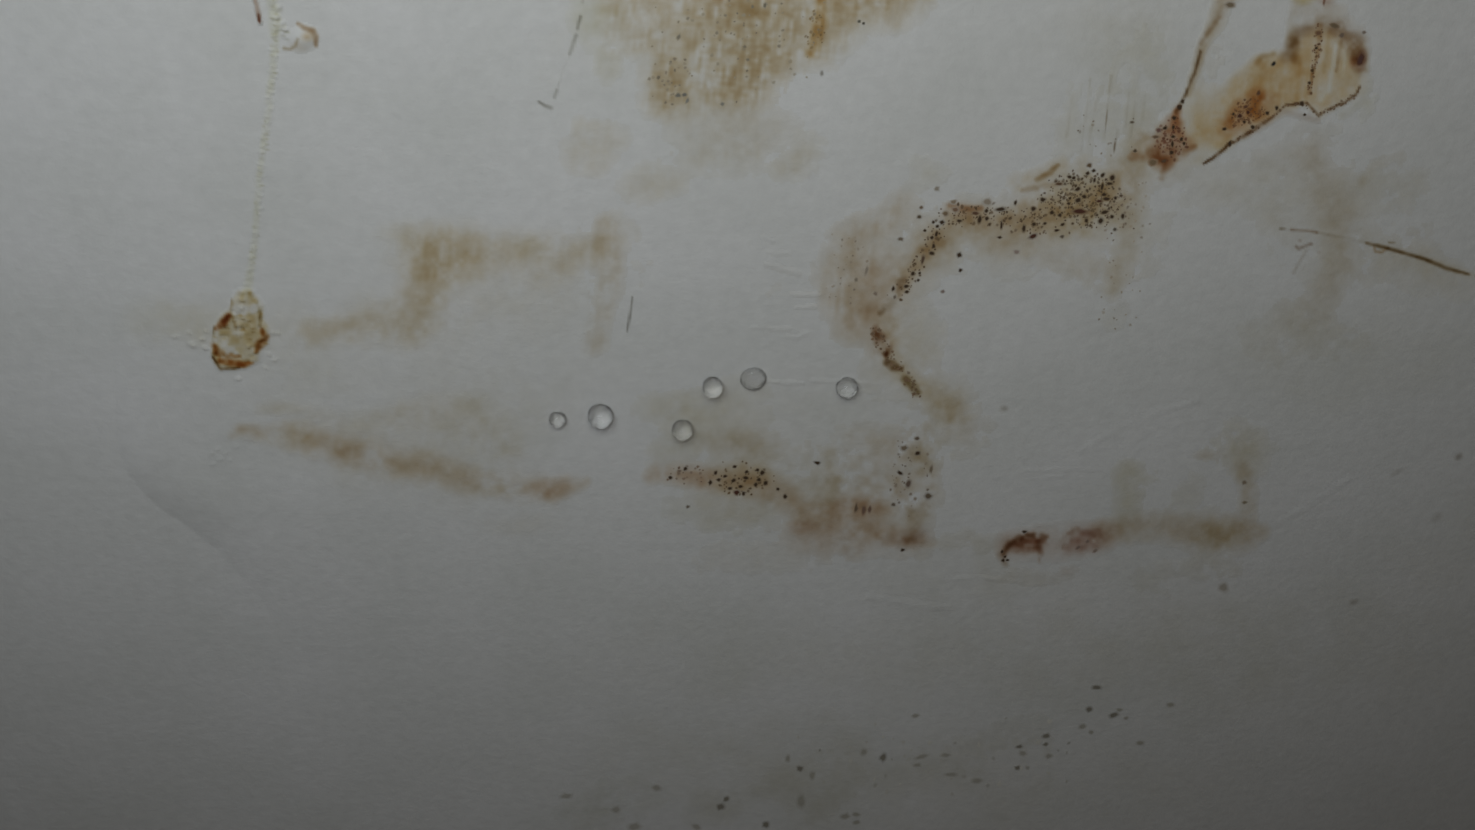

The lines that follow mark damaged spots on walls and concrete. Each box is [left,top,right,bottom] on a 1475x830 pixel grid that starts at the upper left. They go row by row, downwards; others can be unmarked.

peeling [251,0,264,26]
peeling [280,20,322,54]
spalling [171,287,282,381]
leakage [226,0,940,535]
leakage [629,23,1475,599]
crack [1278,227,1475,279]